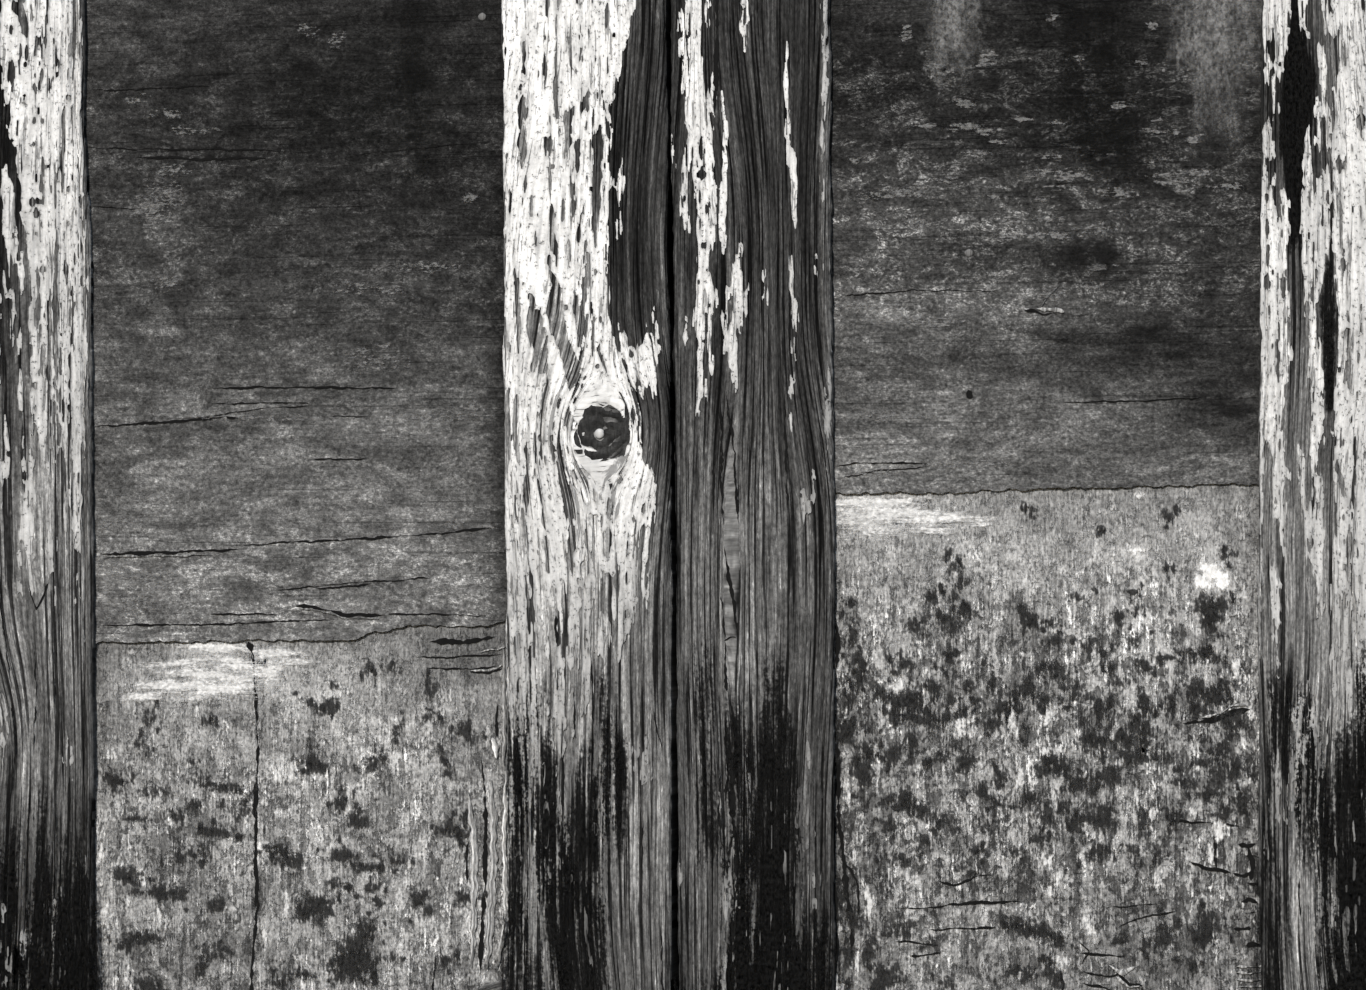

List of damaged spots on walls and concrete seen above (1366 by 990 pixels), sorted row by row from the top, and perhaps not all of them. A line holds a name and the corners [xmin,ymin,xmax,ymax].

peeling [0,0,89,606]
leakage [0,785,169,990]
crack [96,385,398,427]
leakage [102,710,415,990]
crack [102,527,498,558]
crack [101,577,504,990]
leakage [292,680,340,722]
crack [313,455,365,463]
peeling [502,0,661,990]
peeling [671,0,769,416]
leakage [834,544,1366,990]
peeling [1259,0,1366,990]